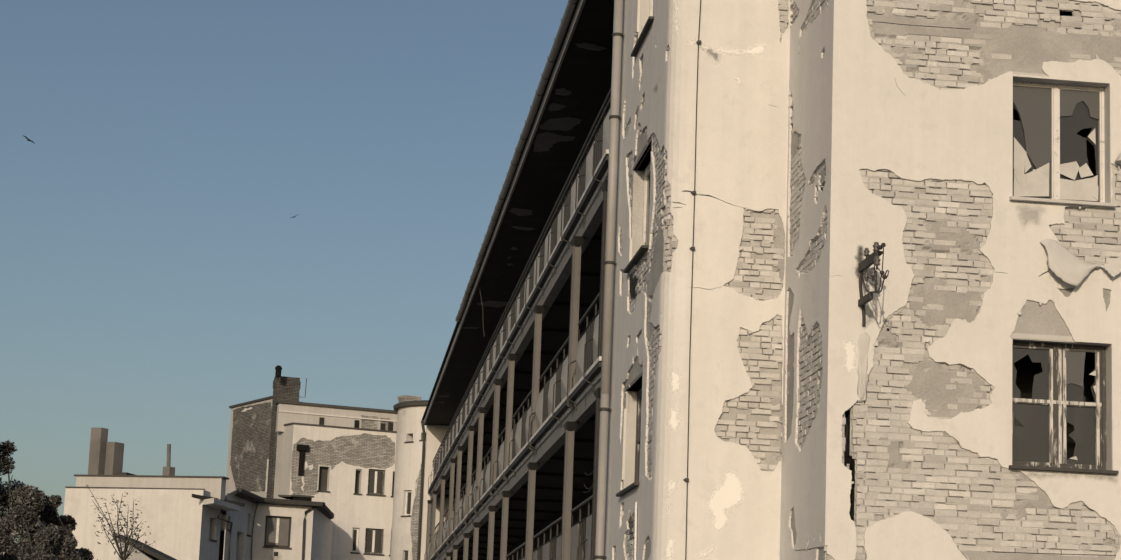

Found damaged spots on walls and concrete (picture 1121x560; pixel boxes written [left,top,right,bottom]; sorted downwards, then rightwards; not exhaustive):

spalling [778,0,830,42]
spalling [866,0,1121,90]
spalling [620,57,684,480]
spalling [707,93,827,475]
spalling [841,164,1121,560]
spalling [291,415,395,496]
spalling [411,464,425,560]
spalling [614,503,651,560]
spalling [818,546,834,560]